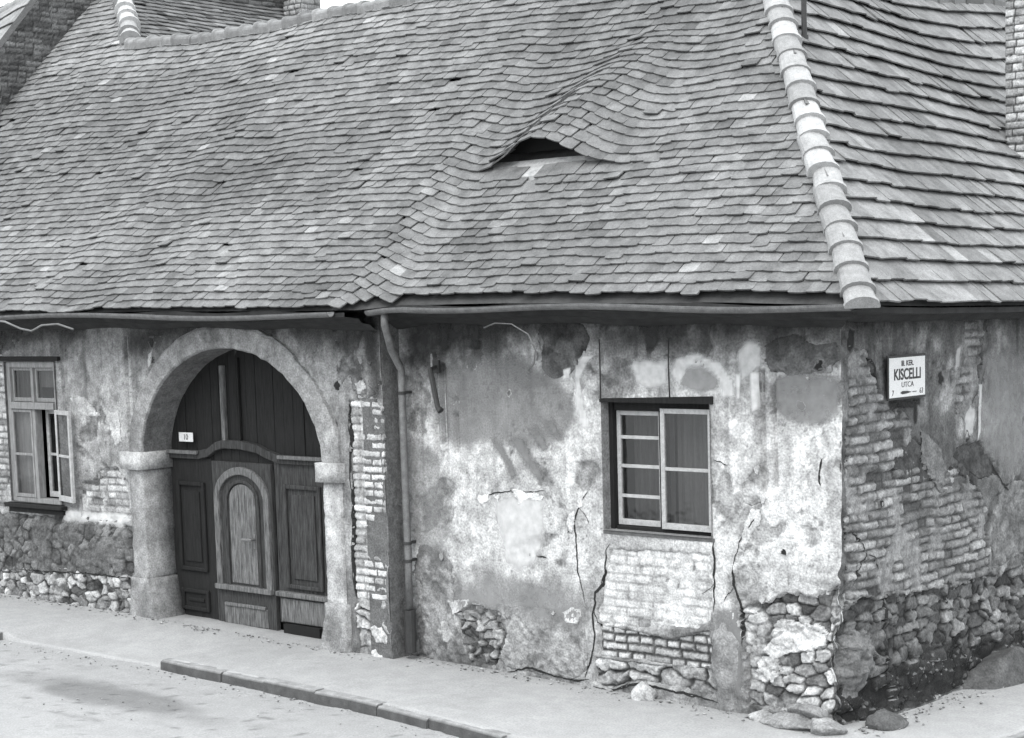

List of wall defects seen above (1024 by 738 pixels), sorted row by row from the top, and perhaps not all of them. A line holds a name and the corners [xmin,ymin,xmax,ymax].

flaking render [0,351,135,577]
flaking render [332,350,388,601]
flaking render [764,319,1024,600]
flaking render [500,606,589,679]
crack [510,490,718,703]
flaking render [599,549,714,668]
flaking render [757,619,829,683]